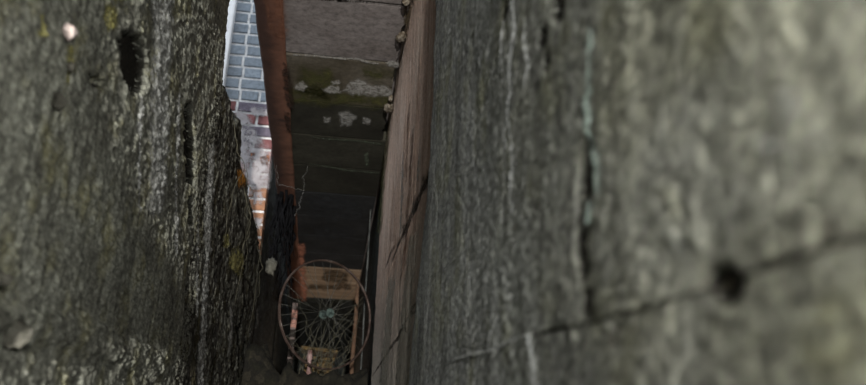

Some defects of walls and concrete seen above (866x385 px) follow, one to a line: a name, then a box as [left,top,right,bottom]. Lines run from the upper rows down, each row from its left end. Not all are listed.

spalling [104,4,144,94]